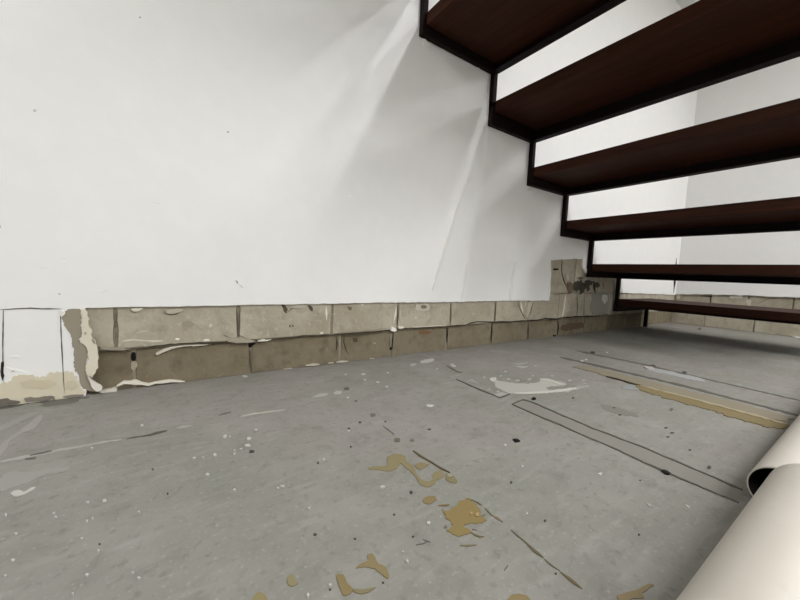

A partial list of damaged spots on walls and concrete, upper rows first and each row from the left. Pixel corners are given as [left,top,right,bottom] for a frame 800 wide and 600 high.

peeling [0,309,103,407]